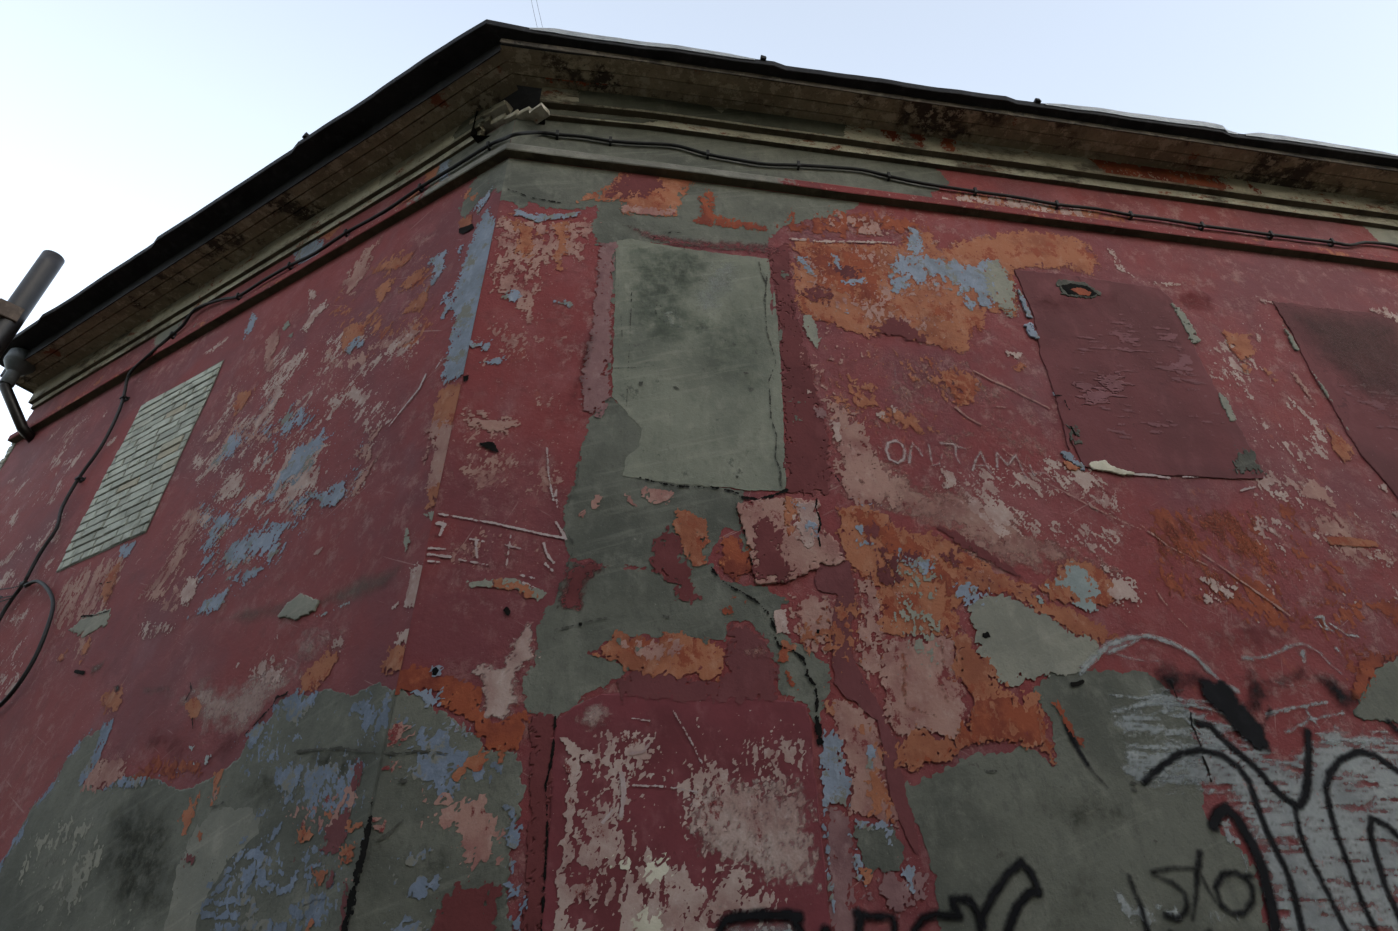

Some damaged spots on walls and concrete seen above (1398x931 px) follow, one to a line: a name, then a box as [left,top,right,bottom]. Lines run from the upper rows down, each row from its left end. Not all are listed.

peeling [393,159,451,210]
peeling [0,408,107,695]
peeling [51,172,1398,931]
crack [639,262,840,745]
crack [294,746,448,784]
crack [341,801,404,931]
crack [540,716,557,931]